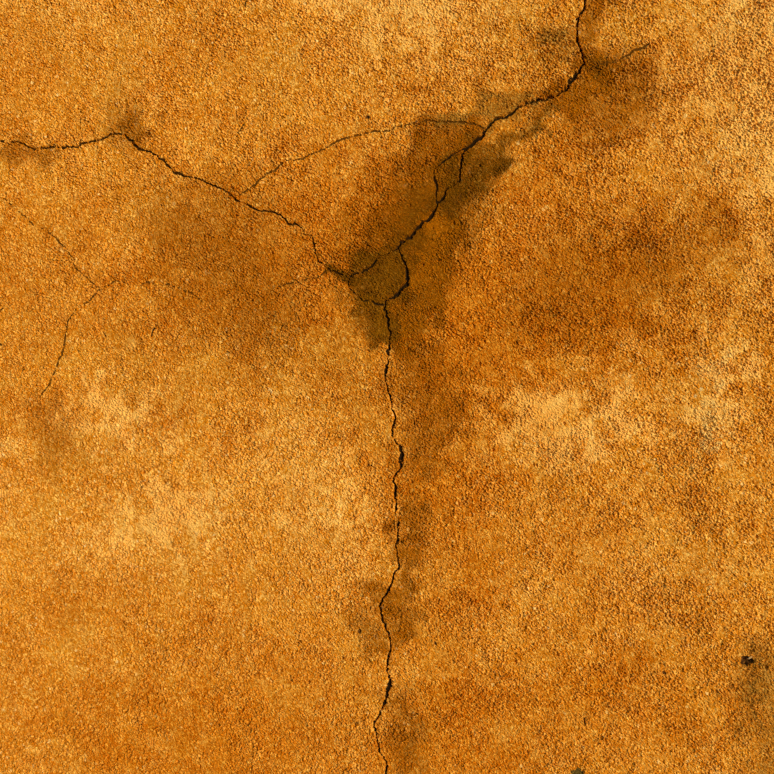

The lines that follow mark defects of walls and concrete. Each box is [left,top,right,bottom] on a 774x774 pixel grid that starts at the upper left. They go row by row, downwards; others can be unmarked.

crack [0,0,649,511]
leakage [326,118,540,349]
crack [373,522,400,774]